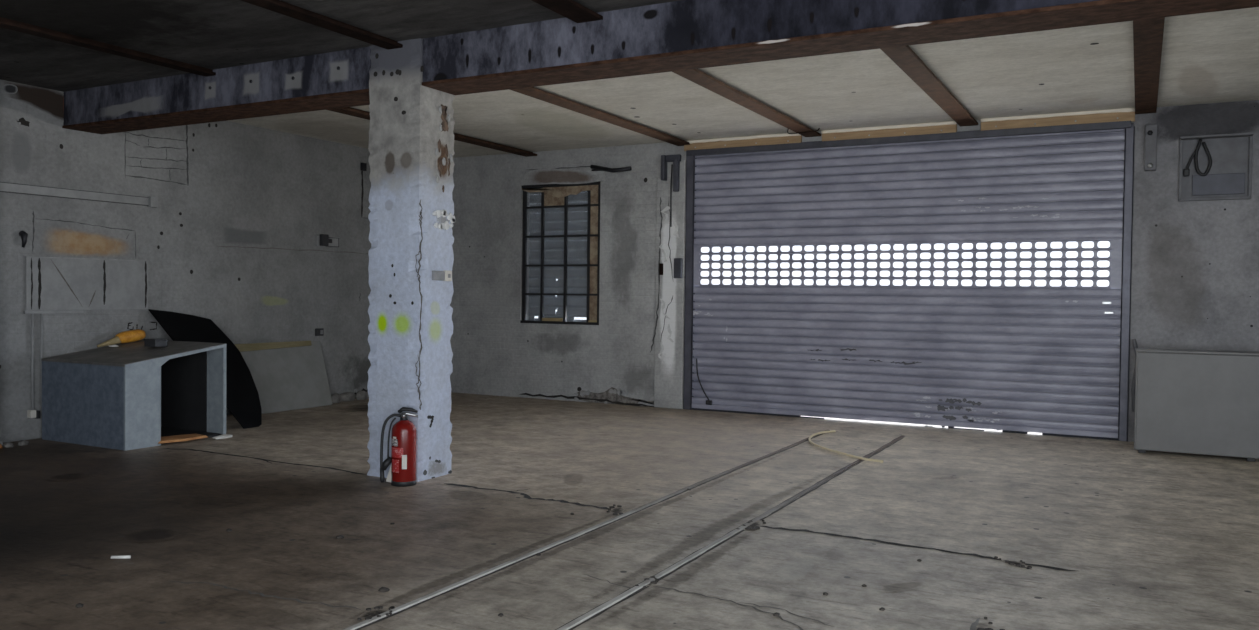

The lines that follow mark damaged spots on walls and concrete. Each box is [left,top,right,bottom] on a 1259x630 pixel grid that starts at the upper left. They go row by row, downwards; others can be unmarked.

spalling [435,104,453,183]
spalling [432,209,455,230]
crack [415,200,434,428]
crack [444,483,610,509]
crack [760,526,1076,571]